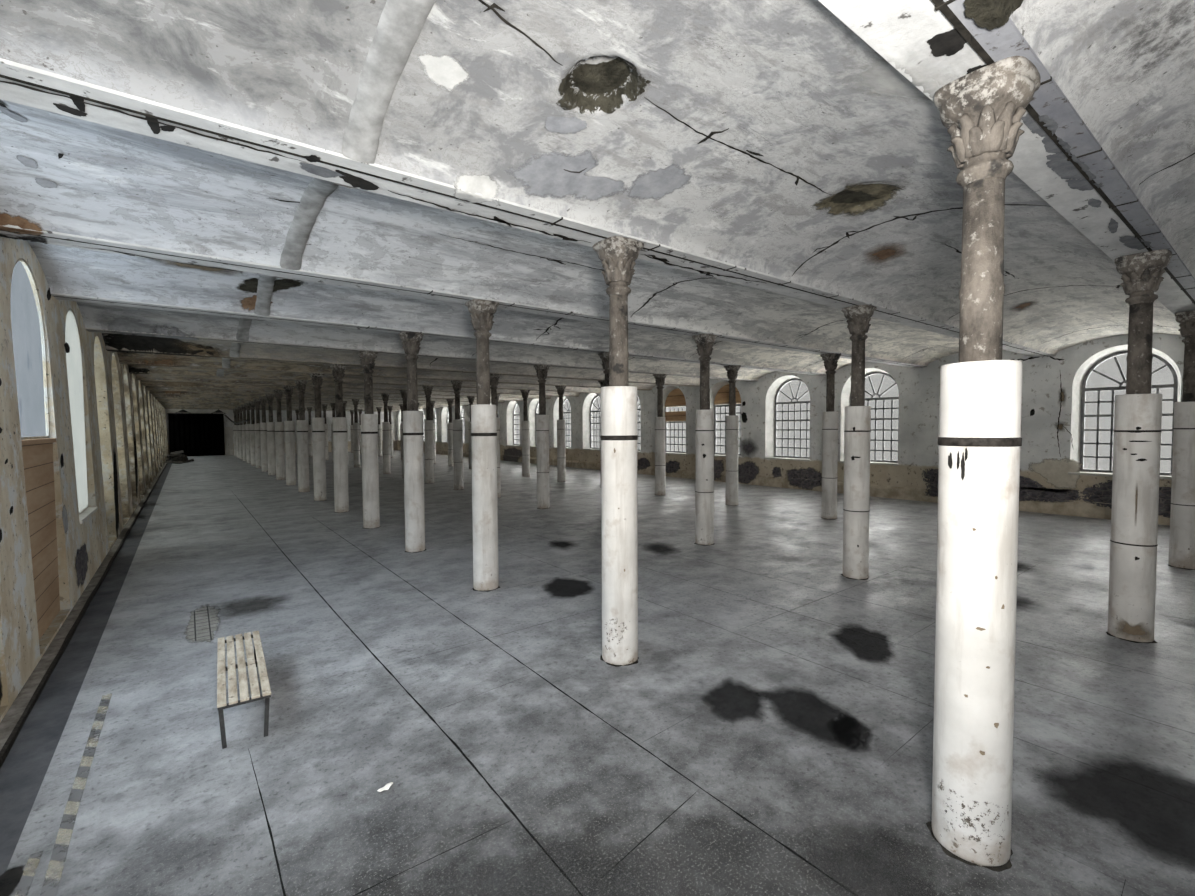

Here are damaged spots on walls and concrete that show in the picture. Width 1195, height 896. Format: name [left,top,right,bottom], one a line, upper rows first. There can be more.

crack [479,0,563,66]
spalling [927,0,1023,57]
hole [545,57,651,134]
crack [388,190,604,271]
peeling [507,150,691,201]
crack [646,98,834,195]
crack [633,207,963,314]
spalling [814,184,901,216]
flaking render [1019,459,1112,509]
water stain [832,625,893,661]
water stain [703,680,872,750]
water stain [1043,762,1195,866]